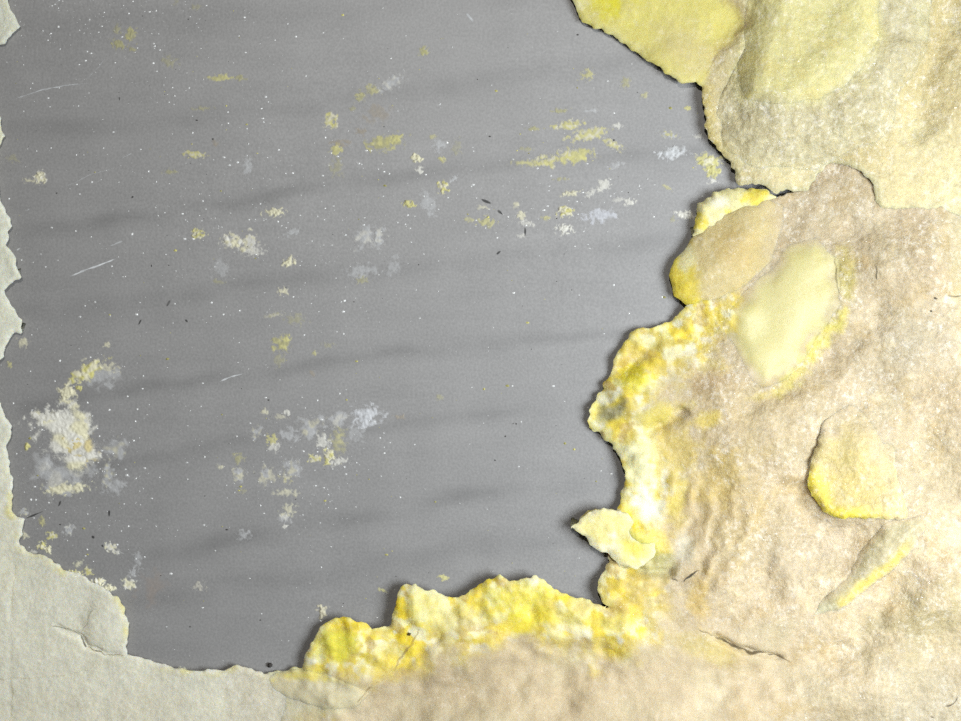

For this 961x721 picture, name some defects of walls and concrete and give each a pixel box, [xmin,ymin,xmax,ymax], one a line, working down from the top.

peeling [32,171,47,184]
peeling [536,109,620,169]
peeling [654,145,685,160]
peeling [696,153,723,179]
peeling [555,189,617,234]
peeling [674,210,697,219]
peeling [223,228,262,254]
peeling [22,358,103,496]
peeling [351,403,387,429]
peeling [307,434,348,465]
peeling [570,508,656,569]
peeling [37,526,137,592]